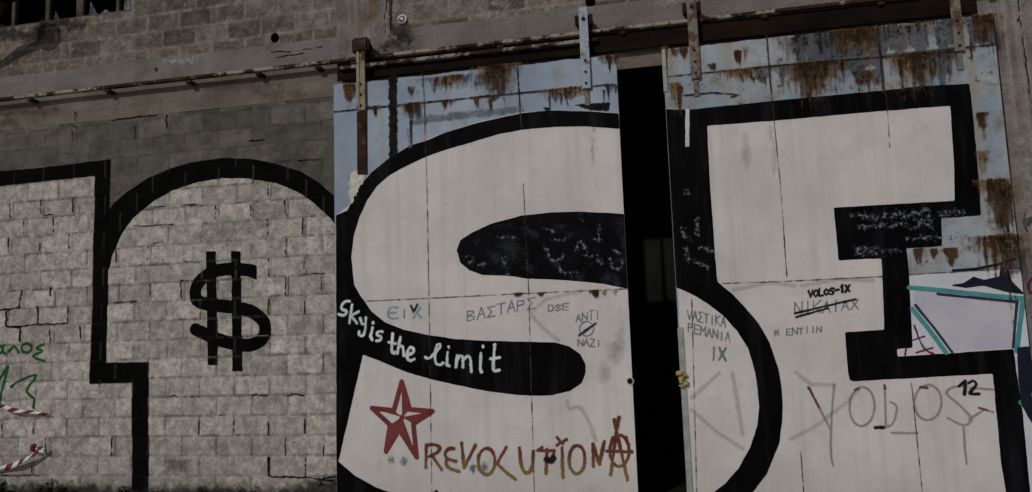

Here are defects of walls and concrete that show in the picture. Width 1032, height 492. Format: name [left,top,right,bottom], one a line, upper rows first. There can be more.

rust [599,54,619,69]
rust [708,13,1005,115]
crack [1017,0,1032,110]
rust [343,83,355,101]
rust [404,86,421,143]
rust [423,63,521,110]
rust [542,86,584,111]
rust [669,82,683,114]
rust [976,112,989,129]
rust [913,247,958,266]
rust [968,178,1030,307]